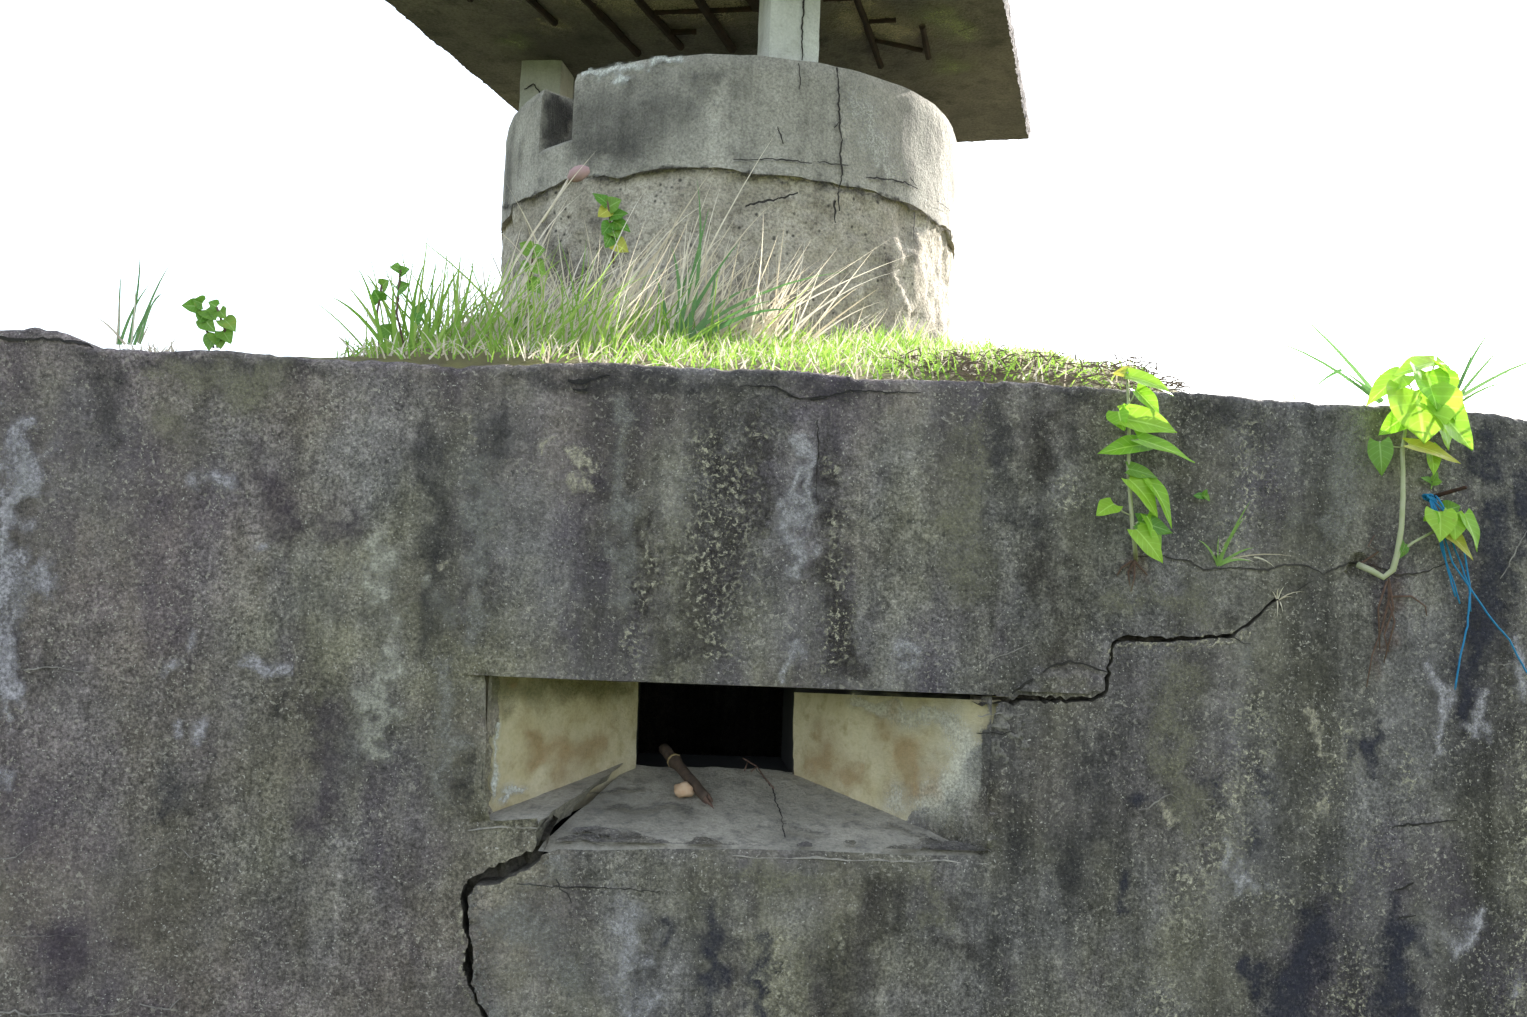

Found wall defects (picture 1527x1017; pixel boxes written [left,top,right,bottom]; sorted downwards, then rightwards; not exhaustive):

crack [733,0,950,240]
water stain [0,417,53,716]
water stain [510,371,700,578]
water stain [664,370,868,676]
crack [970,555,1454,706]
crack [457,815,660,1017]
water stain [1236,910,1331,1017]
water stain [1369,899,1422,1017]
water stain [1452,909,1484,956]